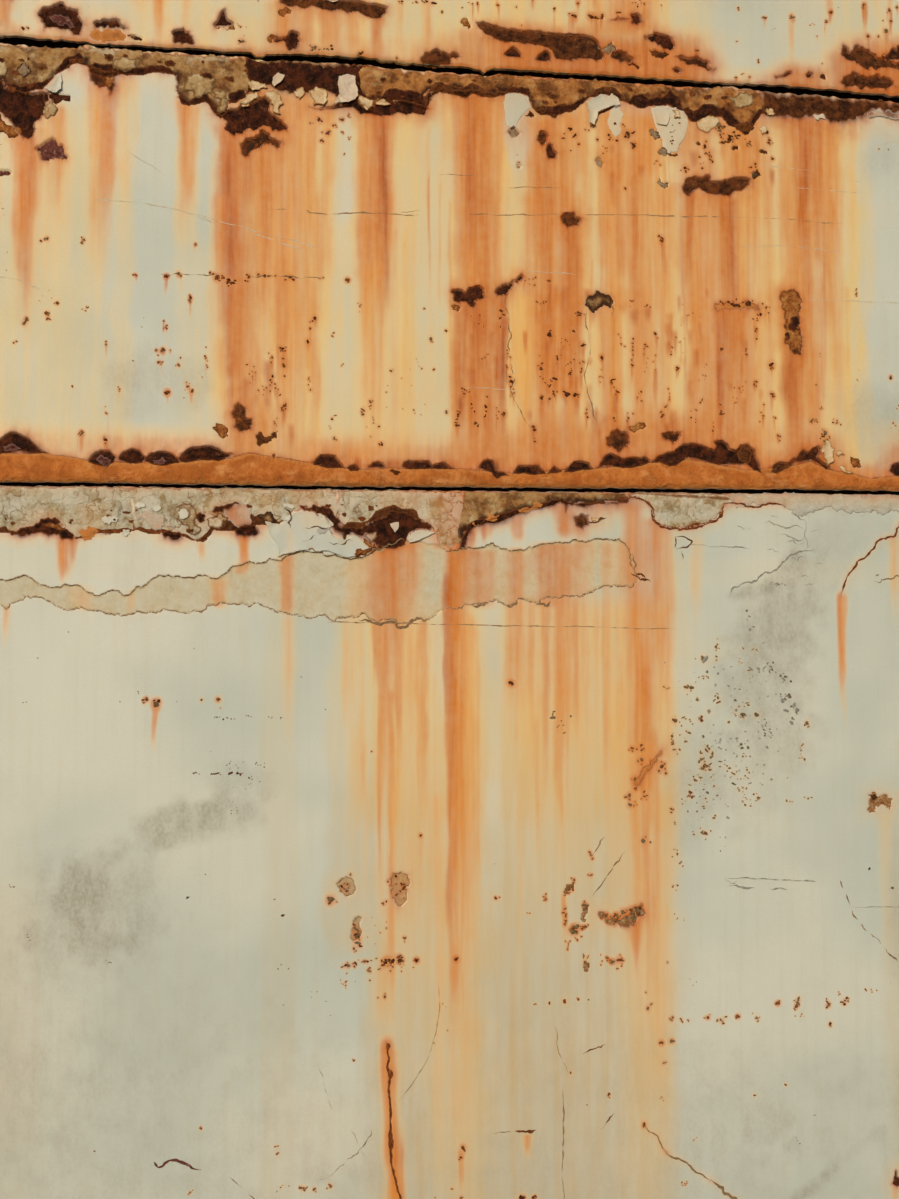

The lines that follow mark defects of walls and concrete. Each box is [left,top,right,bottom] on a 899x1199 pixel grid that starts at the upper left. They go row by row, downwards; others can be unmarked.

peeling [509,126,562,166]
spalling [533,87,566,114]
peeling [578,87,775,161]
peeling [0,502,637,627]
crack [0,495,899,629]
rust [885,539,899,632]
rust [836,593,851,734]
rust [0,481,815,1199]
rust [824,982,891,1031]
crack [646,1128,747,1199]